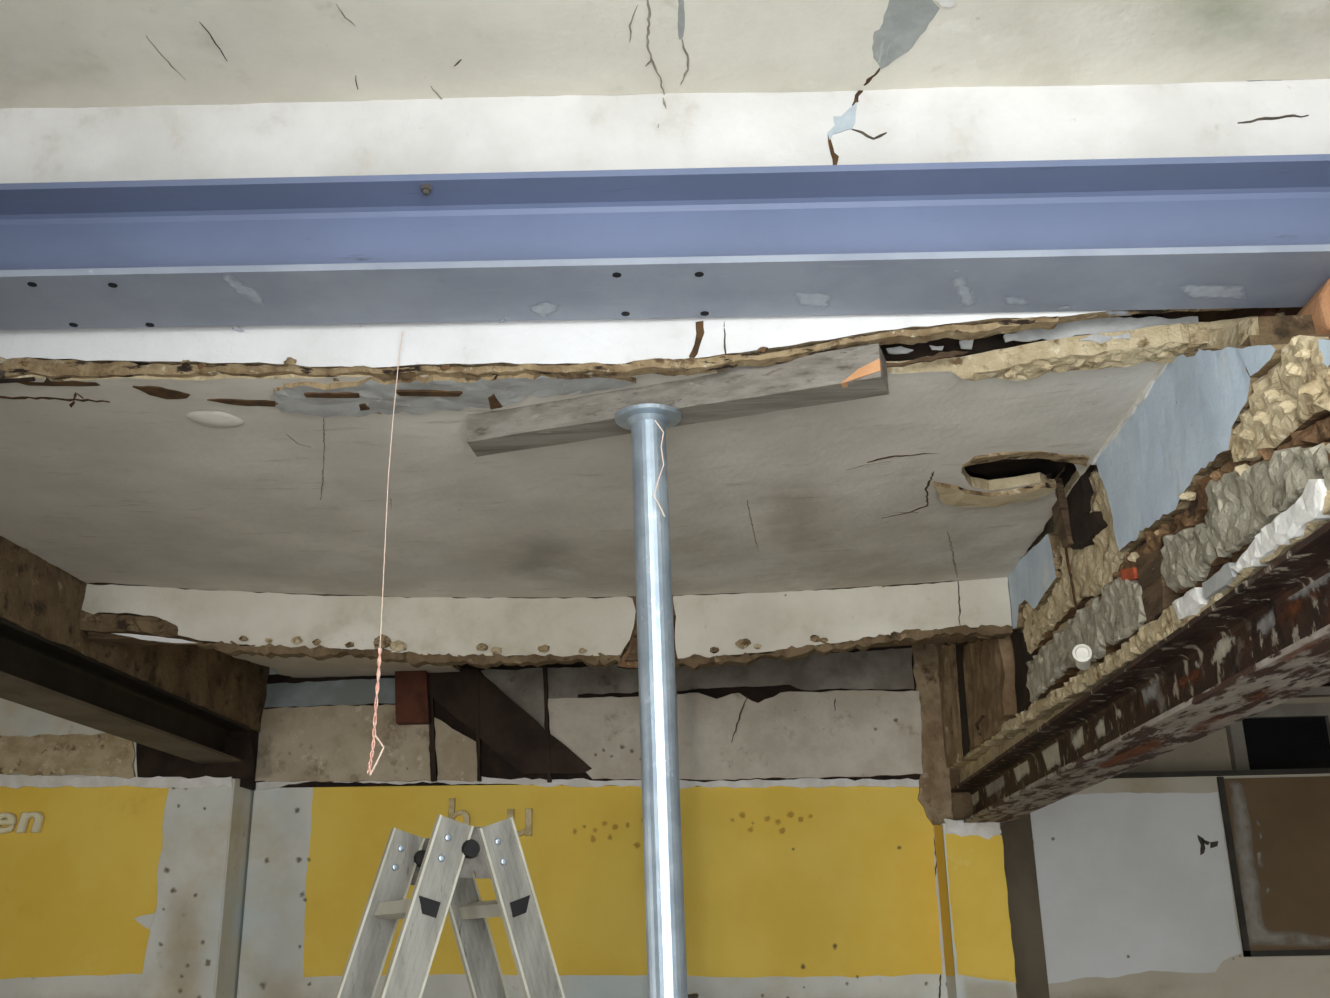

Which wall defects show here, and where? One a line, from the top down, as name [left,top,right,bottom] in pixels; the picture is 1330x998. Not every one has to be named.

crack [629,0,689,128]
peeling [872,0,955,69]
peeling [827,102,857,140]
crack [1237,114,1309,124]
flaking render [0,308,1330,655]
crack [846,453,938,519]
crack [947,531,961,626]
spalling [617,596,638,669]
spalling [672,595,685,666]
peeling [1196,636,1235,667]
peeling [1141,682,1159,704]
peeling [972,710,1121,806]